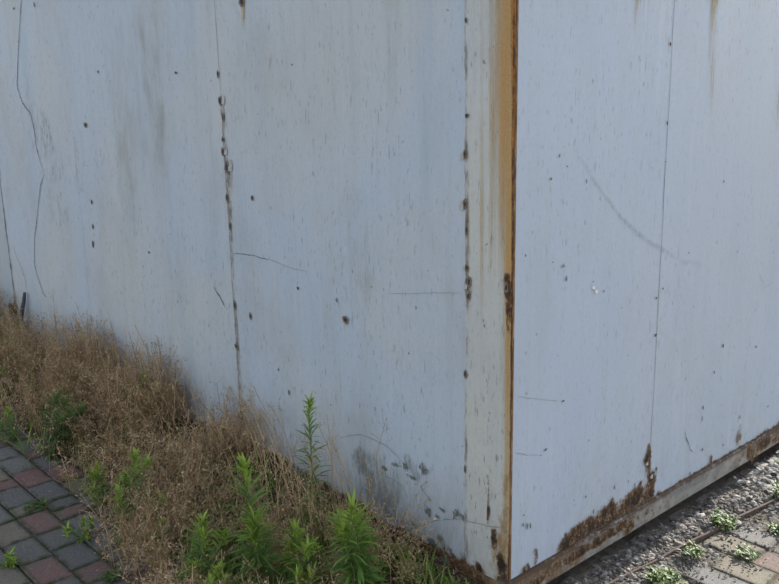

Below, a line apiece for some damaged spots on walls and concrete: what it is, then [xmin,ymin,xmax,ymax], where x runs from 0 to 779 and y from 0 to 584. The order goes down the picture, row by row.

rust [527,443,662,584]
rust [678,423,779,483]